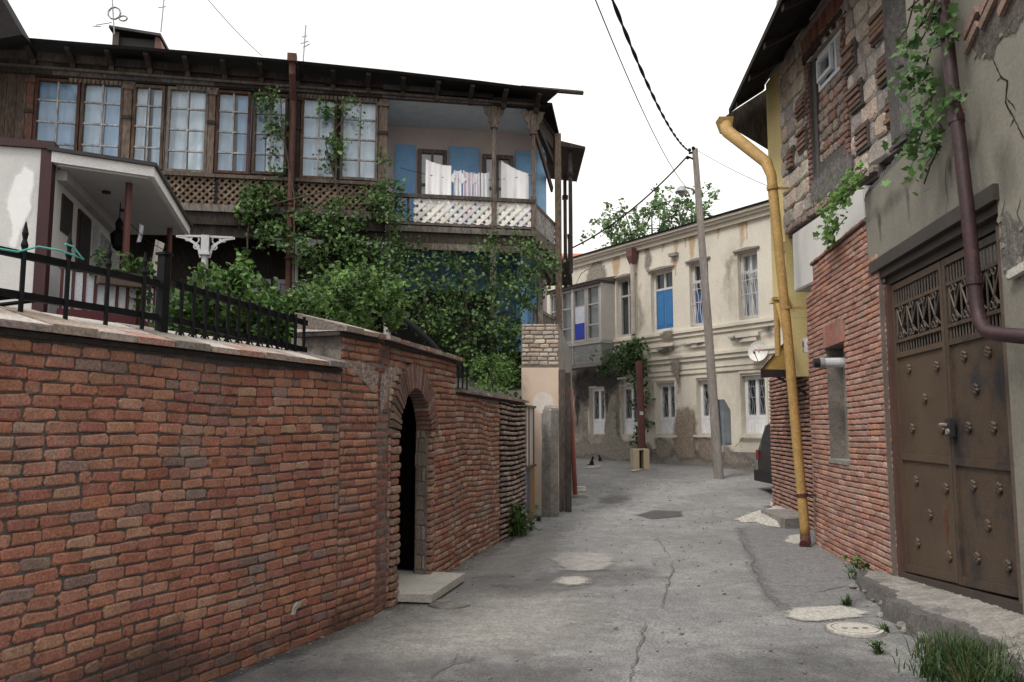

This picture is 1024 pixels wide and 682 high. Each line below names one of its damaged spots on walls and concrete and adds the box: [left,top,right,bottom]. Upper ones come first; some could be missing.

flaking render [961,0,1024,59]
crack [990,53,1024,138]
water stain [572,347,628,439]
flaking render [575,407,756,467]
crack [629,538,674,682]